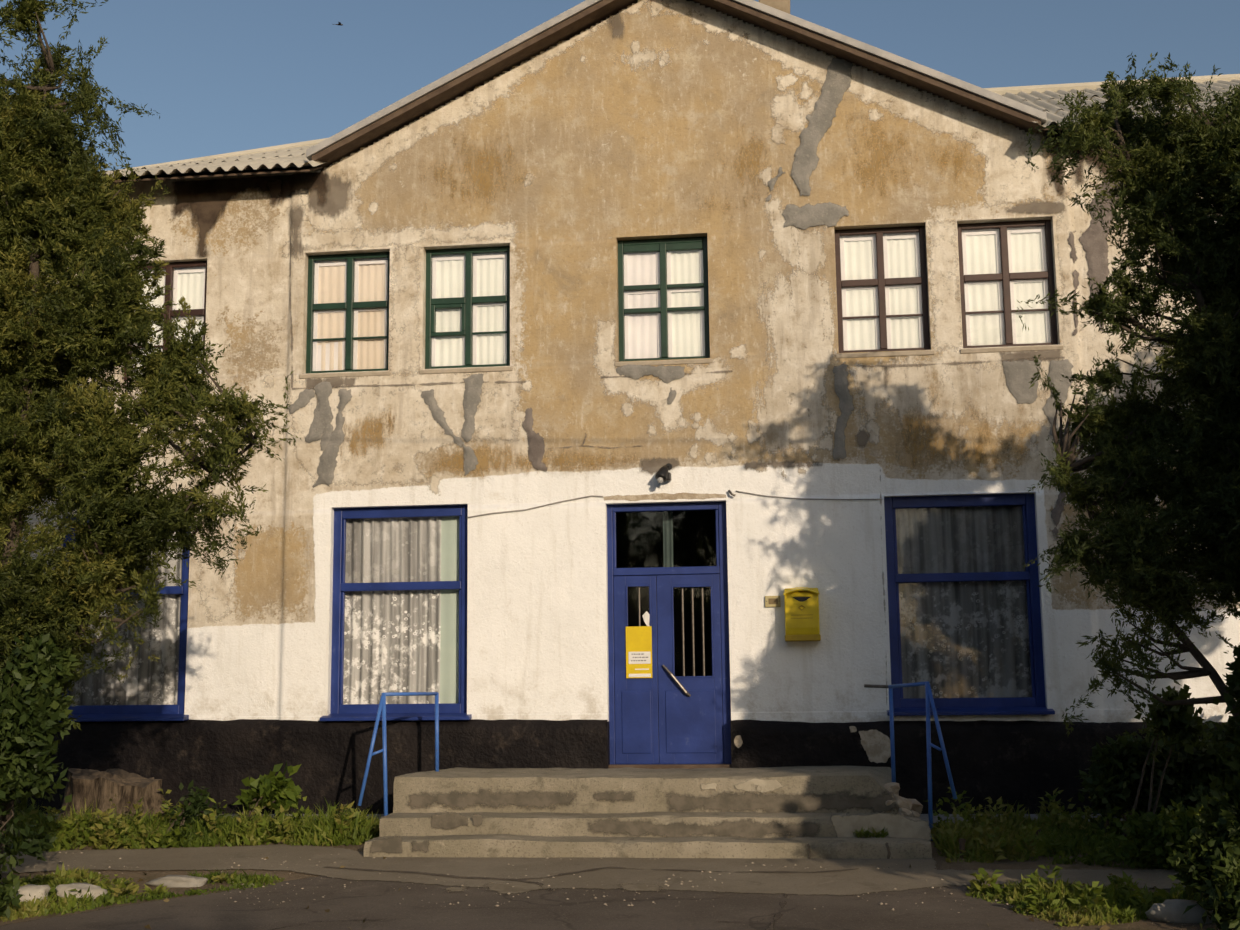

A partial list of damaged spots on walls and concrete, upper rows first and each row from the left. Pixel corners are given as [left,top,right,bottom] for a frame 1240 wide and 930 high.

water stain [173,170,351,257]
peeling [263,0,842,494]
peeling [847,65,1169,478]
flaking render [850,726,891,763]